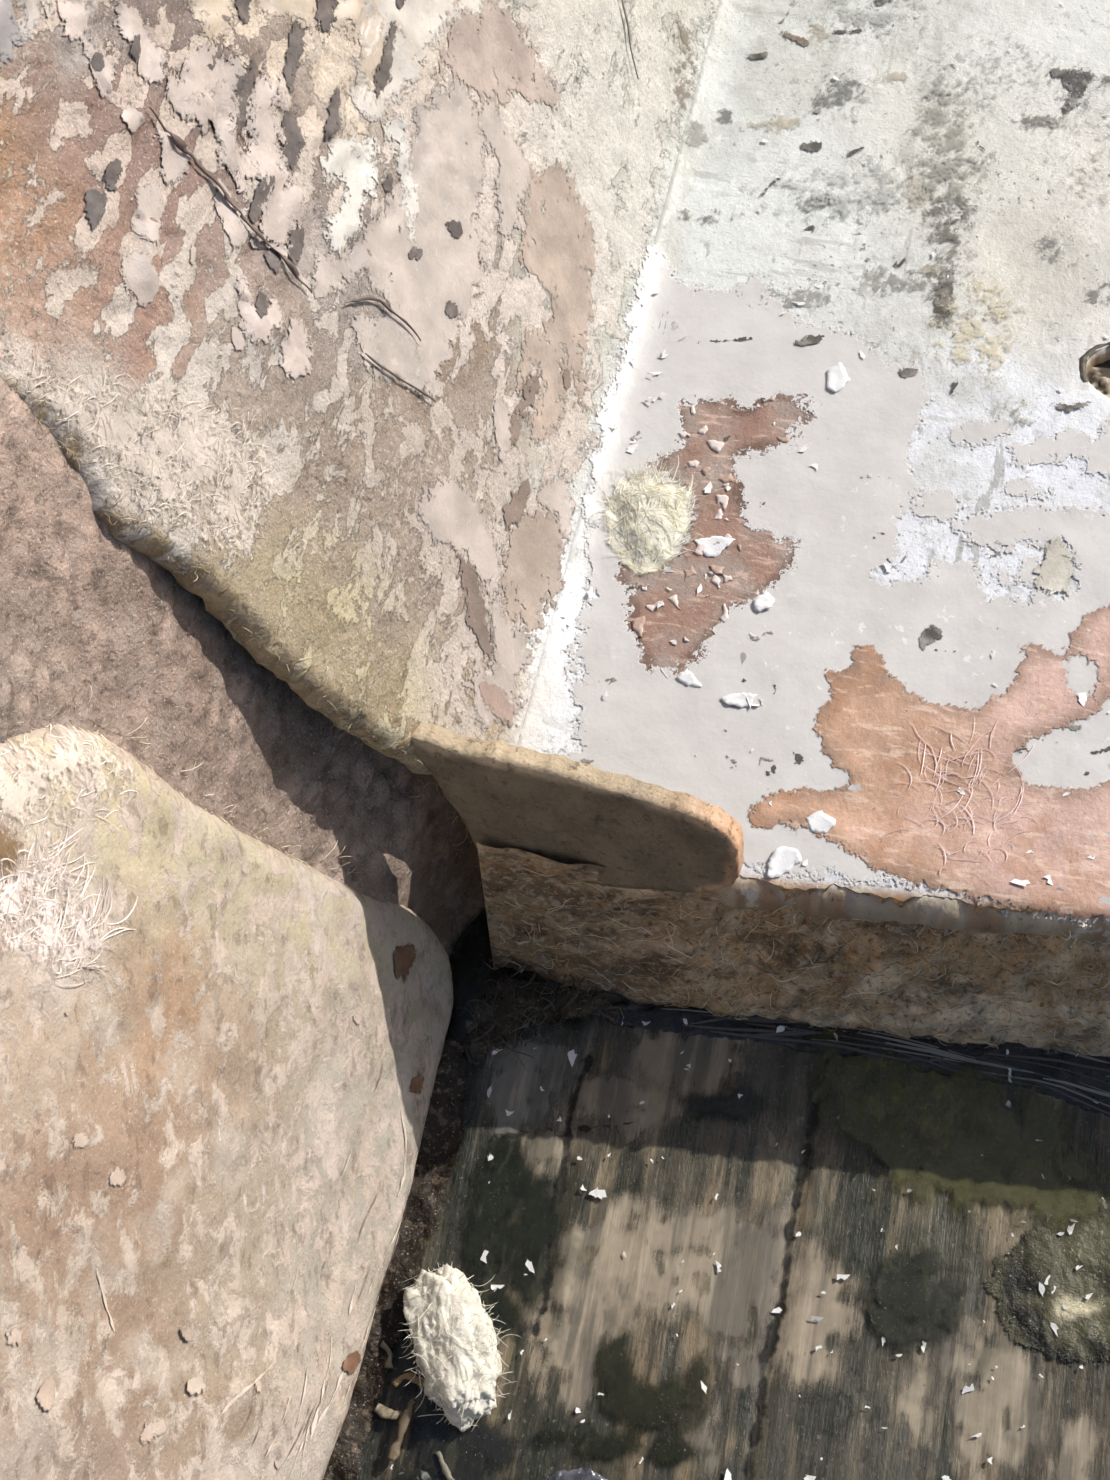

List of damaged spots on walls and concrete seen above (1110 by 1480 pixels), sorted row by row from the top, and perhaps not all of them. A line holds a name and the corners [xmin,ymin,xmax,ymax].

peeling [0,0,117,98]
crack [149,107,312,293]
crack [346,297,421,341]
crack [365,353,436,402]
peeling [84,0,1110,927]
peeling [72,1131,90,1149]
peeling [110,1167,127,1186]
peeling [6,1328,23,1347]
peeling [180,1325,191,1341]
peeling [34,1376,55,1412]
peeling [187,1375,206,1395]
peeling [140,1417,167,1445]